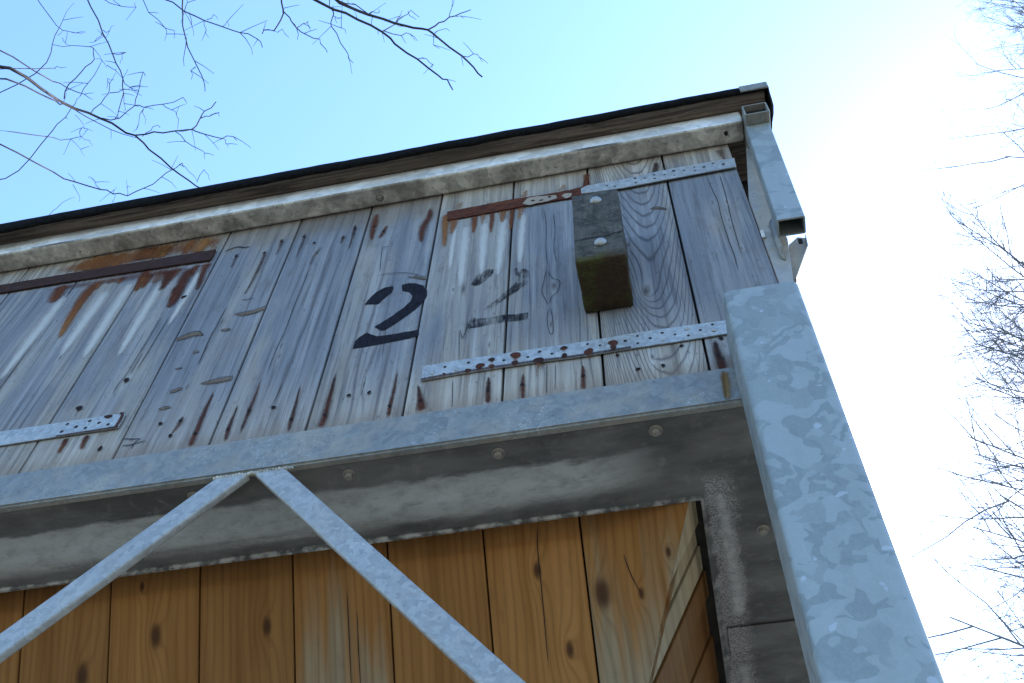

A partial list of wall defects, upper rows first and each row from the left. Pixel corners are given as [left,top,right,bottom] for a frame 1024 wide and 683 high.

rust [419,209,457,245]
rust [472,208,522,232]
rust [50,285,66,302]
rust [59,239,216,337]
rust [189,393,213,446]
rust [224,383,260,440]
rust [319,376,335,426]
rust [417,340,631,410]
rust [713,341,730,398]